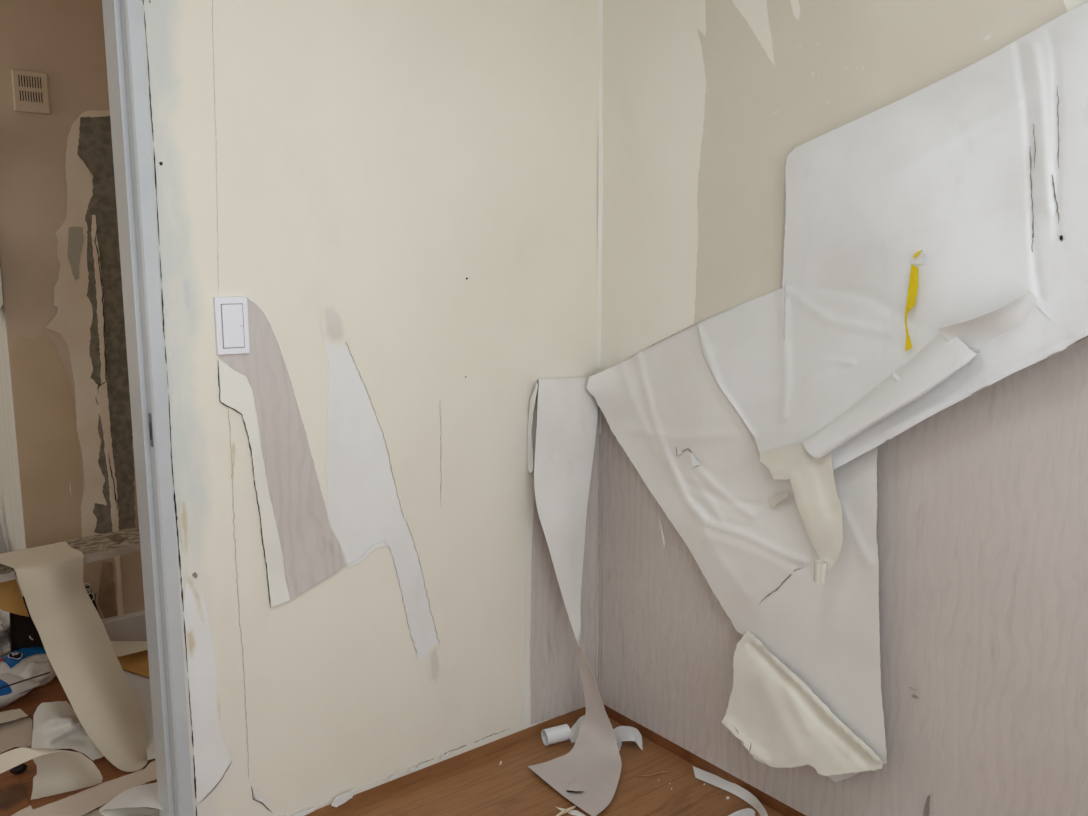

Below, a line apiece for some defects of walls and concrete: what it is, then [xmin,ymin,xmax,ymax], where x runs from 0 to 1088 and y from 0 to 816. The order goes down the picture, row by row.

peeling [11,110,136,548]
peeling [94,556,124,619]
peeling [218,297,443,689]
peeling [694,0,1068,324]